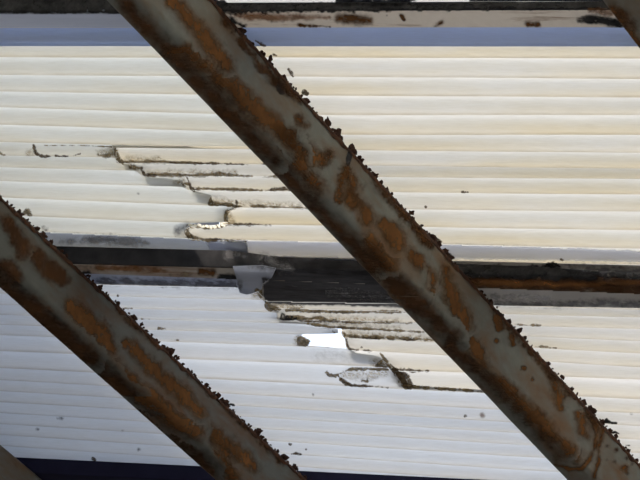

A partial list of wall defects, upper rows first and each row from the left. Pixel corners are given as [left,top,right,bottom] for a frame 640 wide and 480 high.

corrosion [0,195,307,480]
corrosion [119,0,406,274]
spalling [295,336,310,347]
corrosion [208,0,640,479]